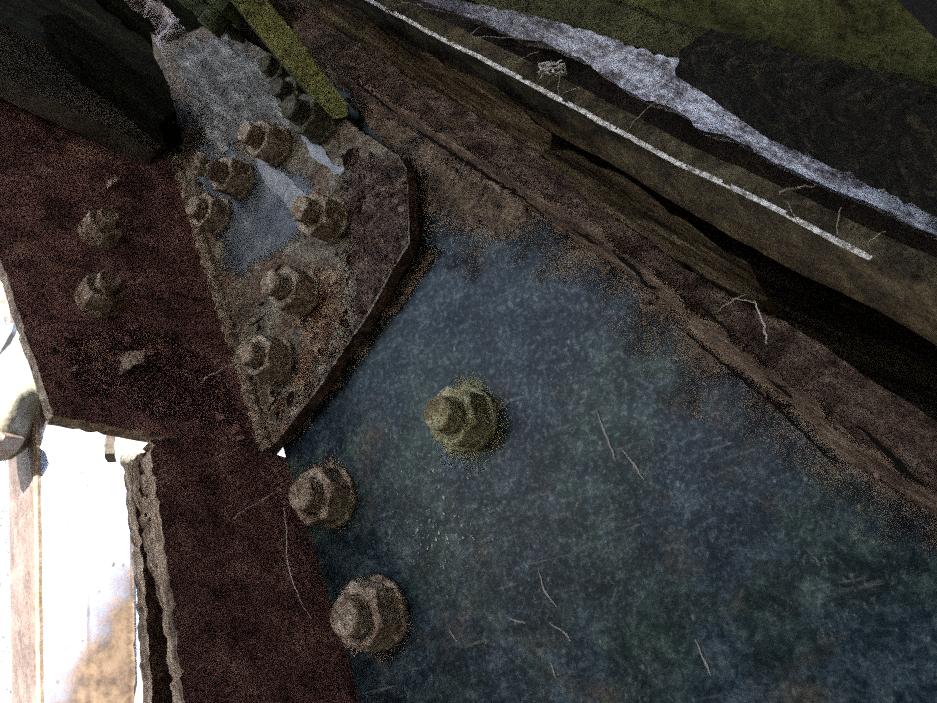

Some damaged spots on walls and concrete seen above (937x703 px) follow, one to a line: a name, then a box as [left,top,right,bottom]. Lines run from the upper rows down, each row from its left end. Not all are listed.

corrosion [277,61,937,546]